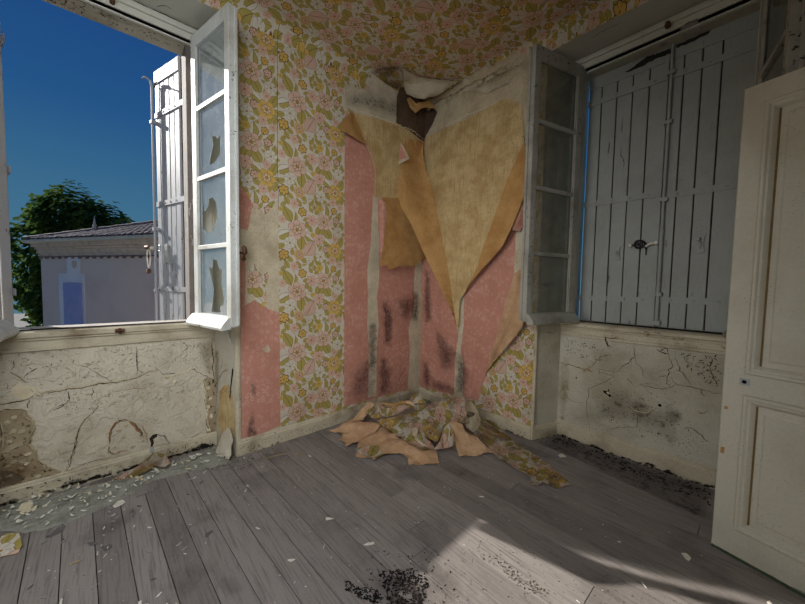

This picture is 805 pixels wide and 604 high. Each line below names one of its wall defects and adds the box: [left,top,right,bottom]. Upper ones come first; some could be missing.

flaking render [344,73,400,123]
flaking render [425,49,529,144]
peeling [626,19,710,72]
spalling [0,367,99,502]
crack [0,343,233,472]
spalling [108,419,199,473]
spalling [200,338,255,460]
crack [549,335,719,442]